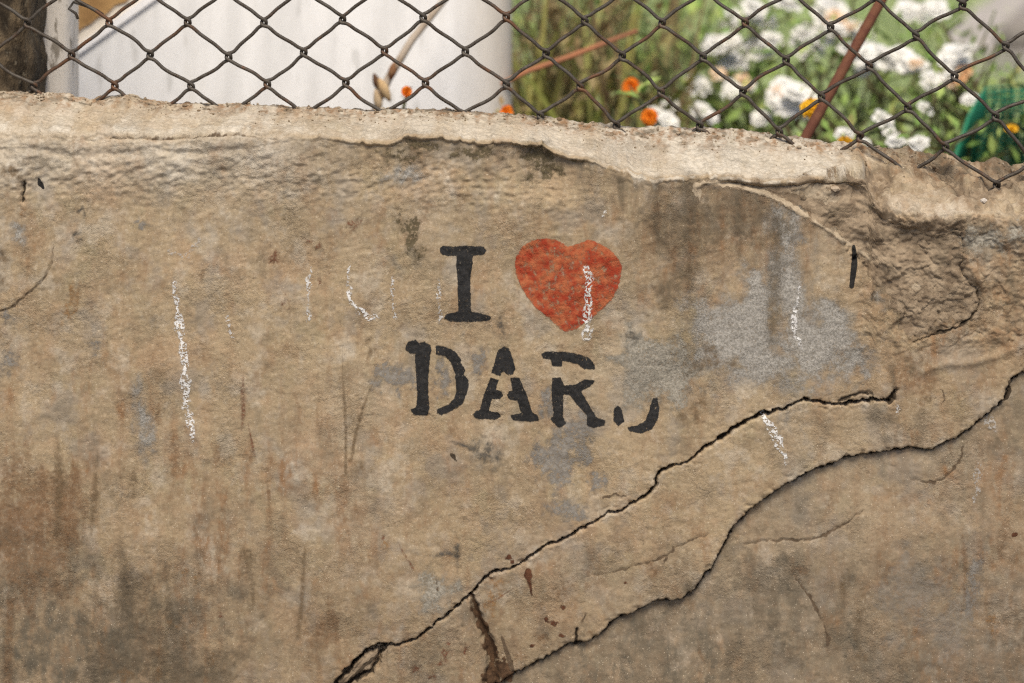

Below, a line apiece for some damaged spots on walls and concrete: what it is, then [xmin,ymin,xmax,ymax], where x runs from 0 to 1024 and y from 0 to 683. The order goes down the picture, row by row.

spalling [606,166,1024,411]
crack [598,371,1023,590]
crack [334,629,426,683]
crack [573,609,638,644]